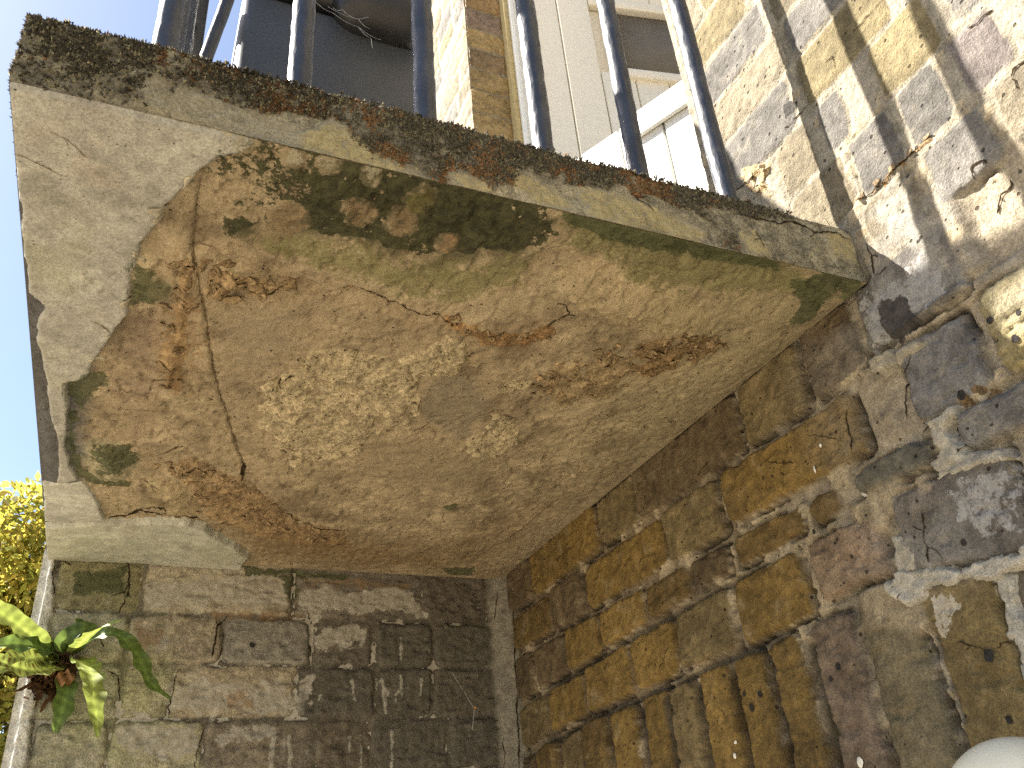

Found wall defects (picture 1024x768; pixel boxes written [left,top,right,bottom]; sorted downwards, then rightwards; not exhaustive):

water stain [130,70,581,257]
spalling [741,161,772,198]
crack [865,147,919,198]
crack [728,171,886,275]
peeling [10,82,347,570]
crack [185,174,243,465]
crack [328,285,444,320]
spalling [444,314,561,350]
spalling [529,333,729,409]
water stain [59,369,135,487]
water stain [373,635,404,715]